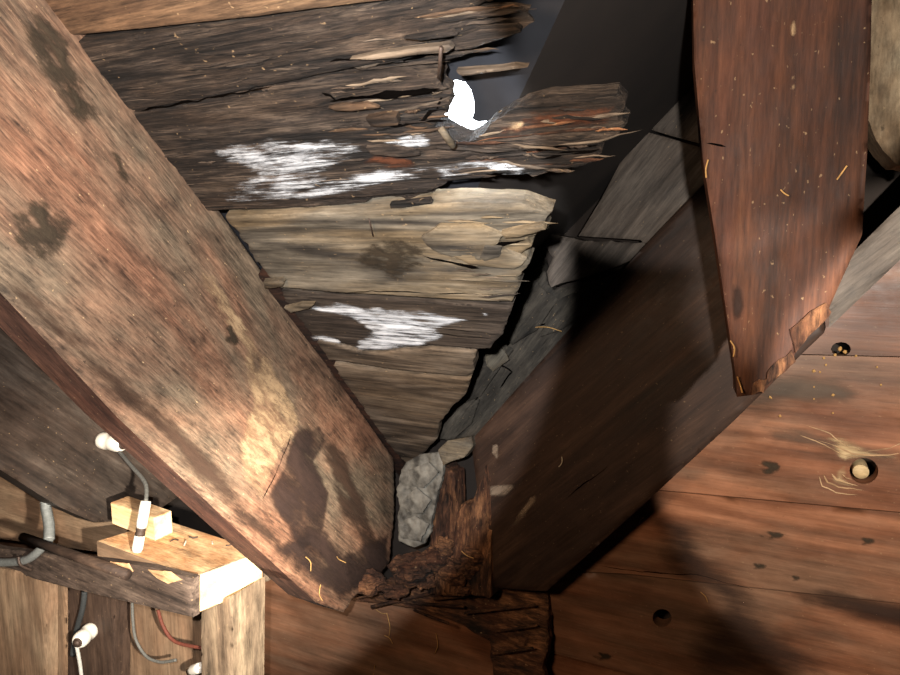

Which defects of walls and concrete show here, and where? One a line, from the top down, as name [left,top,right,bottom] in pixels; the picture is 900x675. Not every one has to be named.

water stain [28,15,95,119]
crack [143,86,271,111]
peeling [366,144,421,157]
water stain [387,136,427,147]
water stain [112,152,127,179]
water stain [218,143,411,197]
water stain [465,162,520,174]
peeling [480,245,502,261]
water stain [314,305,461,349]
water stain [96,369,388,594]